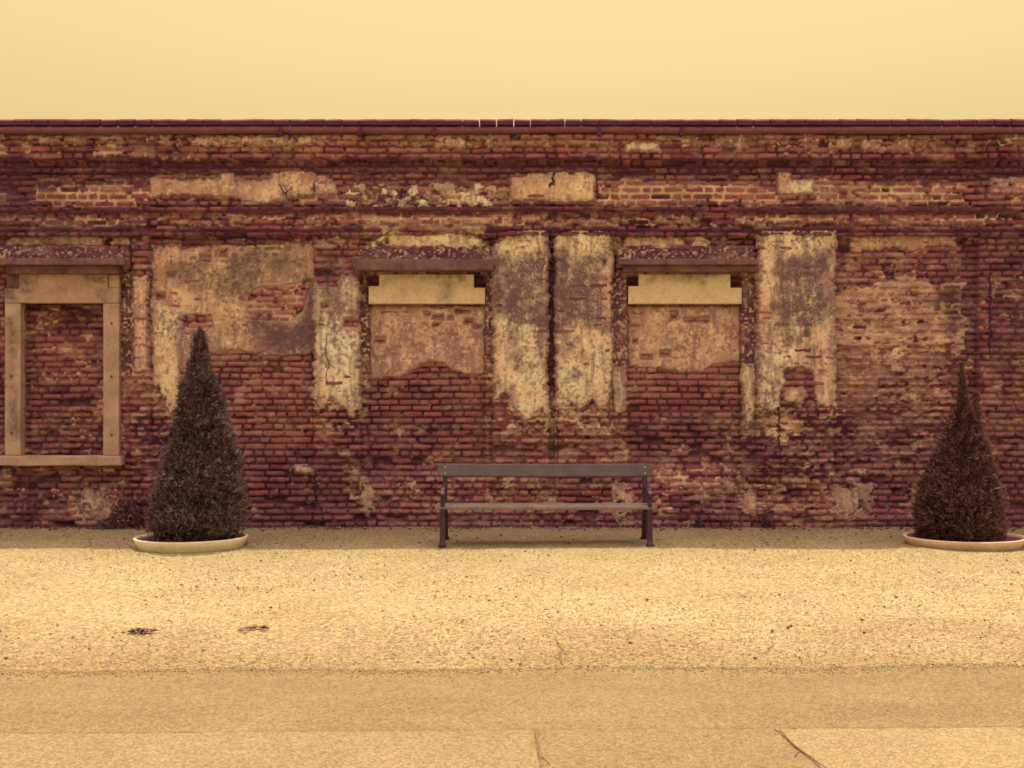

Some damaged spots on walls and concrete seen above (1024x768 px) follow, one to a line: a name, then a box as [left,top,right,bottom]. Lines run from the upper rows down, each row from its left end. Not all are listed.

peeling [149,169,598,208]
peeling [132,229,958,425]